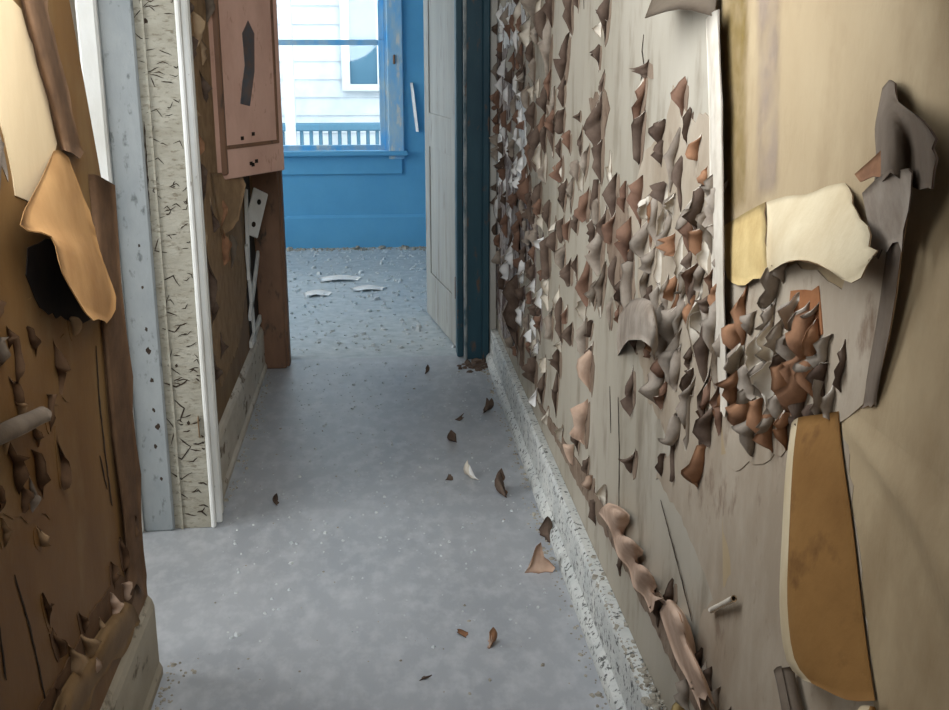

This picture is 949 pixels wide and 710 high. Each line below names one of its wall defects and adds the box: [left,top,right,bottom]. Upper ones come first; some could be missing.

peeling [0,299,41,415]
spalling [25,239,90,324]
peeling [198,132,232,381]
spalling [243,176,262,348]
peeling [489,0,886,710]
peeling [0,340,72,547]
peeling [42,592,106,676]
peeling [110,537,133,614]